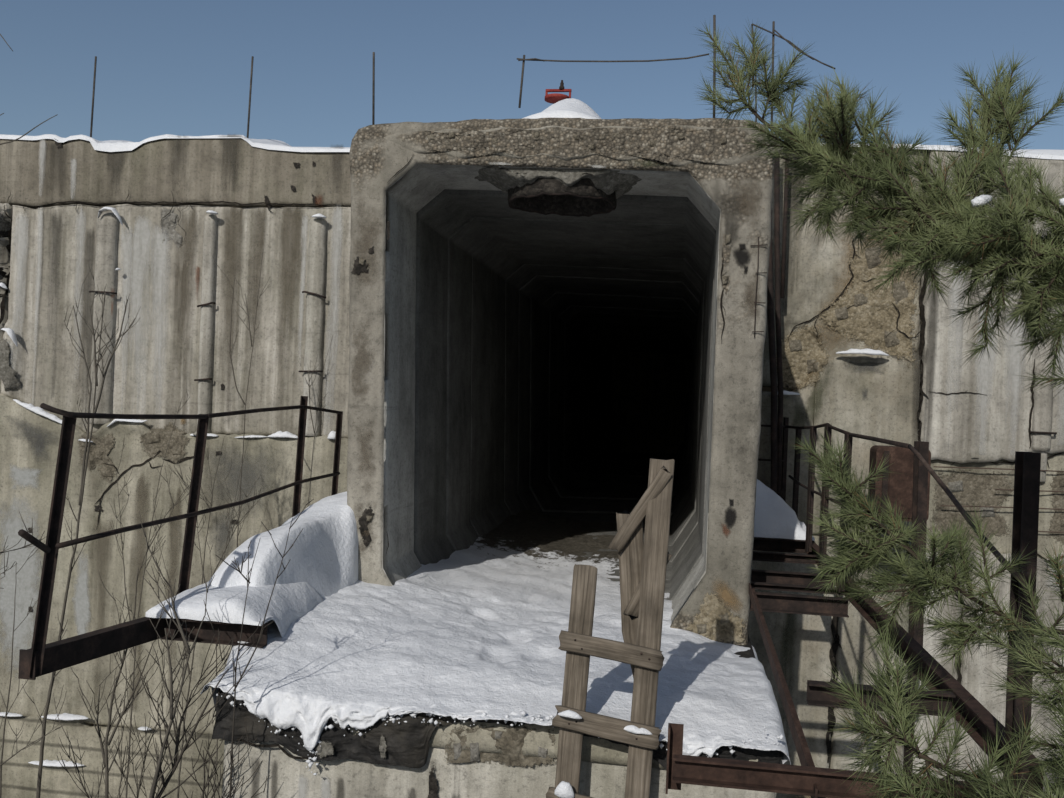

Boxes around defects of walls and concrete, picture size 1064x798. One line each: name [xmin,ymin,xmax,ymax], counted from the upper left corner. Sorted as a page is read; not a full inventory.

damp [110,151,123,173]
damp [122,220,166,367]
crack [0,191,344,324]
damp [283,207,307,342]
spalling [776,235,920,390]
crack [886,252,984,441]
crack [991,359,1064,467]
spalling [358,507,374,547]
corrosion [723,499,736,535]
spalling [686,592,746,644]
crack [829,596,842,682]
spalling [427,724,556,798]